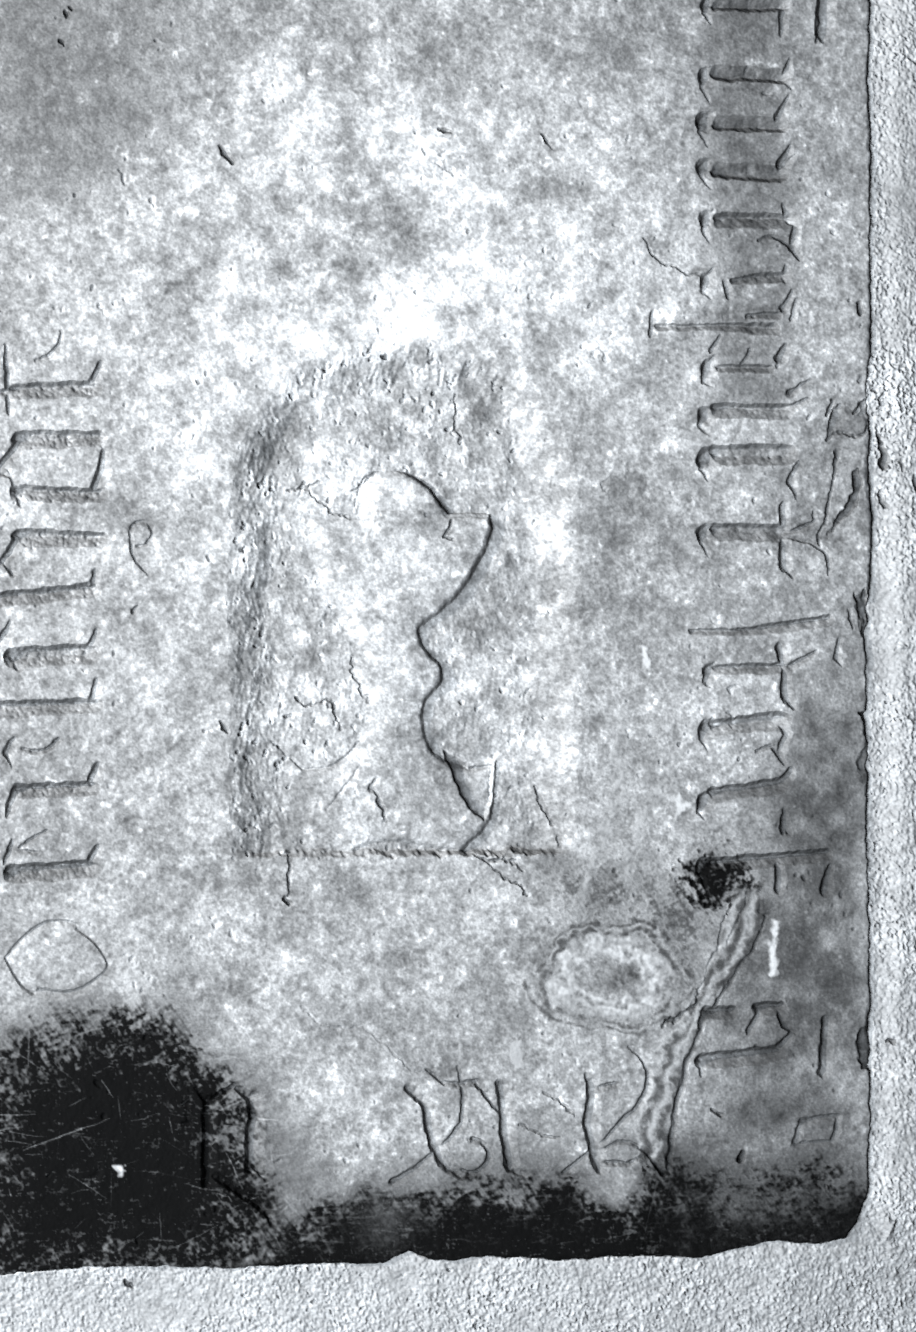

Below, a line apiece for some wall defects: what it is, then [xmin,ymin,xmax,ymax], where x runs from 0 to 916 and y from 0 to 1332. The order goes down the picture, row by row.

crack [442,519,457,542]
leakage [0,1006,867,1275]
crack [661,893,771,1175]